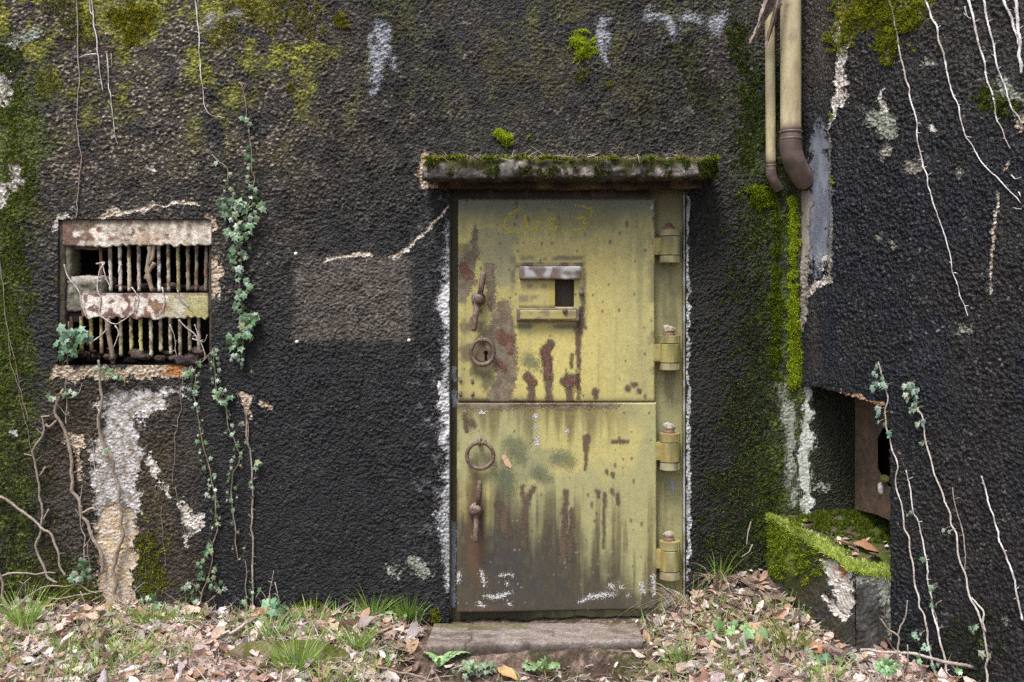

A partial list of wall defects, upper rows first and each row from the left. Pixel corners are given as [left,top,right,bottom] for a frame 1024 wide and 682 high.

spalling [81,244,225,299]
crack [323,205,449,263]
peeling [799,118,834,332]
rust [457,228,619,433]
peeling [432,218,463,608]
spalling [50,317,210,606]
rust [494,484,536,550]
rust [559,489,574,562]
rust [595,469,620,548]
peeling [475,568,515,608]
spalling [820,558,892,639]